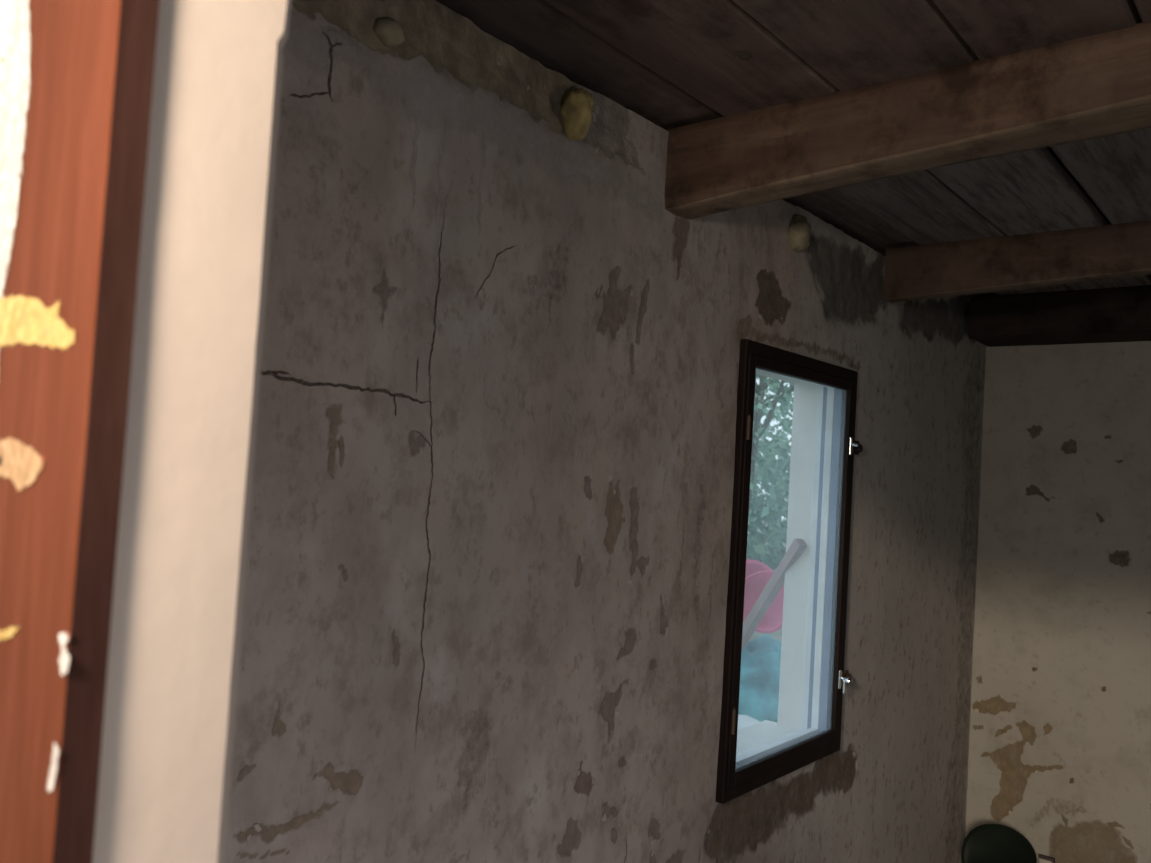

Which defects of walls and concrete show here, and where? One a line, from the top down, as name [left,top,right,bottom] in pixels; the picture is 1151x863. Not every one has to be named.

crack [289,31,344,100]
flaking render [292,0,639,168]
peeling [0,437,44,491]
crack [261,200,446,753]
flaking render [973,695,1074,821]